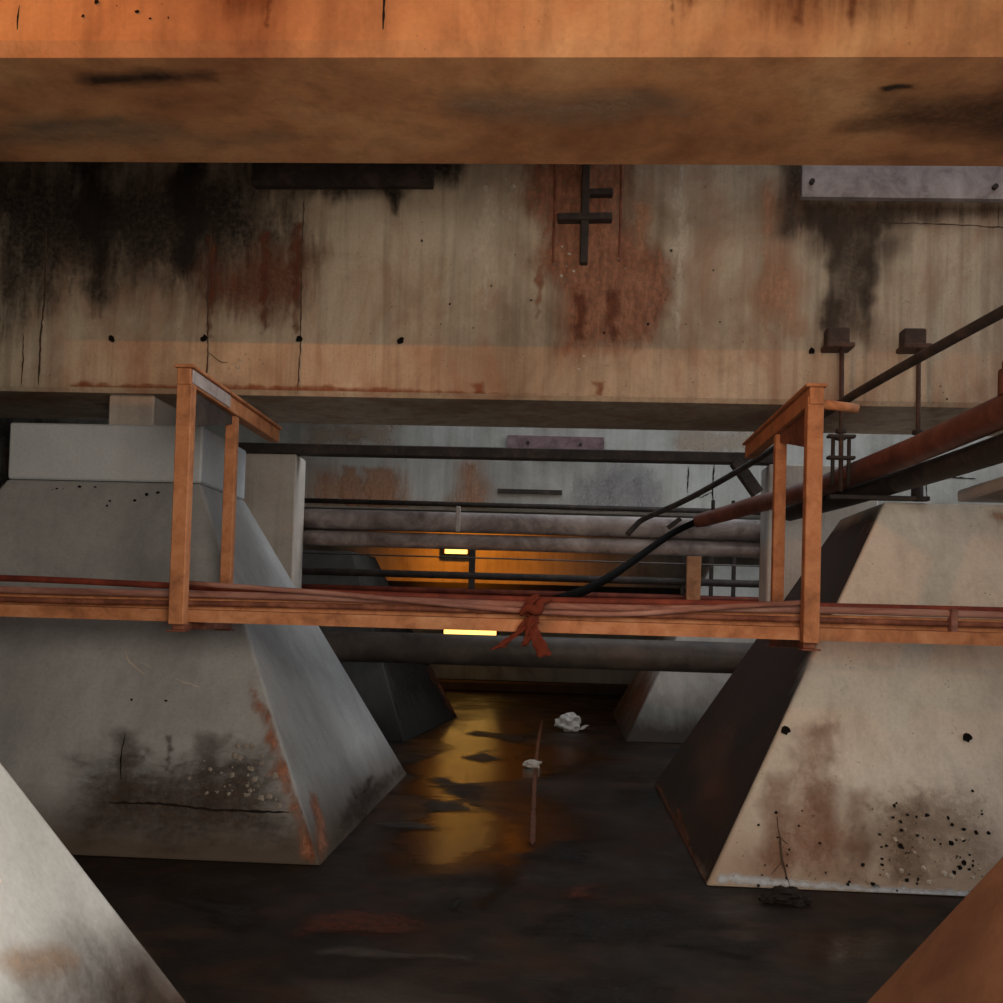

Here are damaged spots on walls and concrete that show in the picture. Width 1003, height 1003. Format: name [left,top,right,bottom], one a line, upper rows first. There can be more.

crack [379,0,387,29]
damp [73,162,108,302]
damp [171,162,205,273]
rust [526,164,673,350]
damp [776,165,1003,334]
damp [784,577,801,601]
damp [820,510,877,615]
damp [85,742,274,838]
crack [109,733,290,813]
spalling [184,742,282,808]
damp [654,639,968,896]
spalling [865,802,991,892]